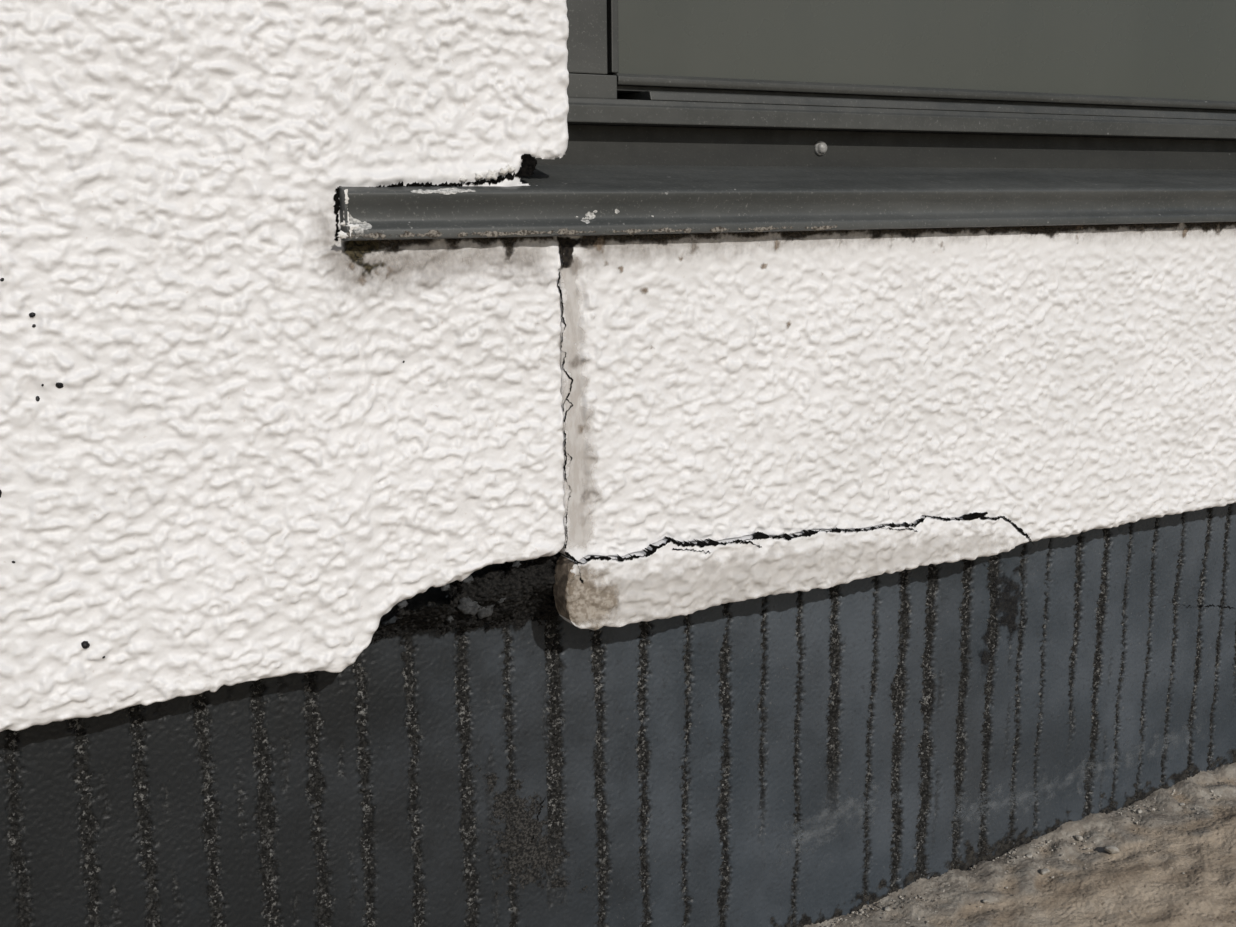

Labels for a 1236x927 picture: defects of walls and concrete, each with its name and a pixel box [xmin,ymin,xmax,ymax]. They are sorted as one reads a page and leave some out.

crack [557,236,1035,584]
spalling [370,555,571,645]